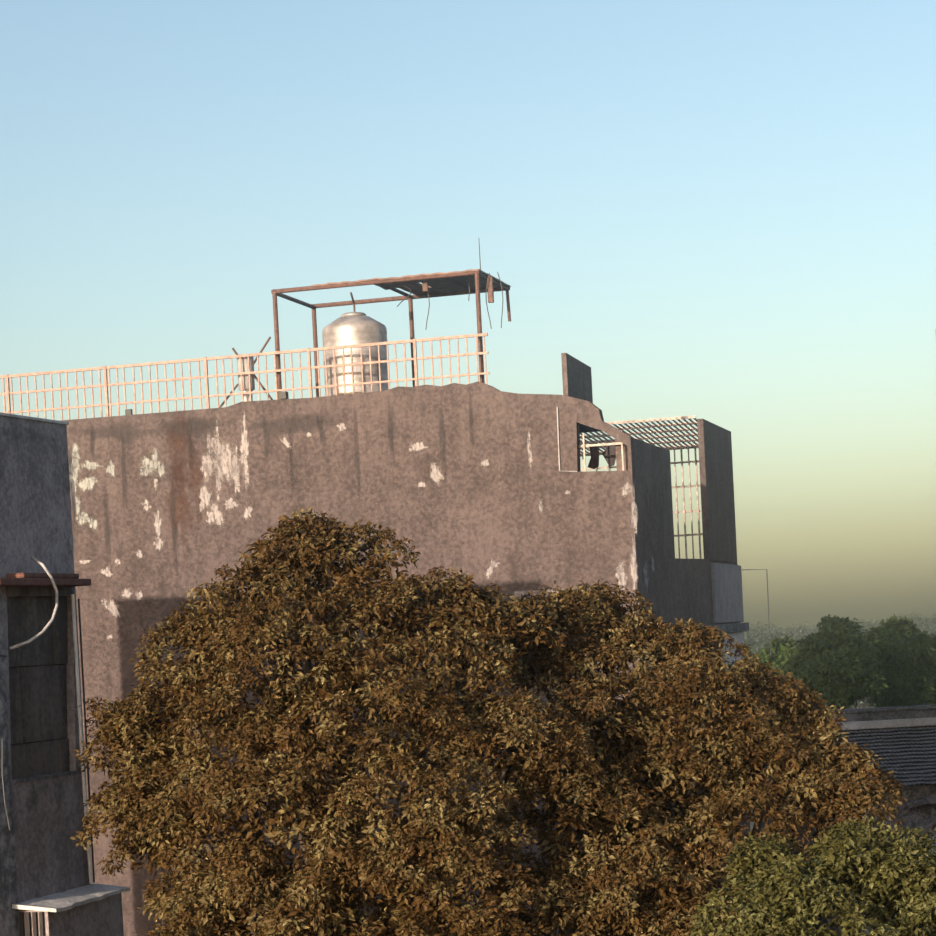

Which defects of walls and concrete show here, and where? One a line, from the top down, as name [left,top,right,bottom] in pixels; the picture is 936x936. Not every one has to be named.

peeling [70,444,115,529]
peeling [140,449,165,491]
peeling [199,415,252,525]
peeling [144,500,163,550]
peeling [101,589,143,617]